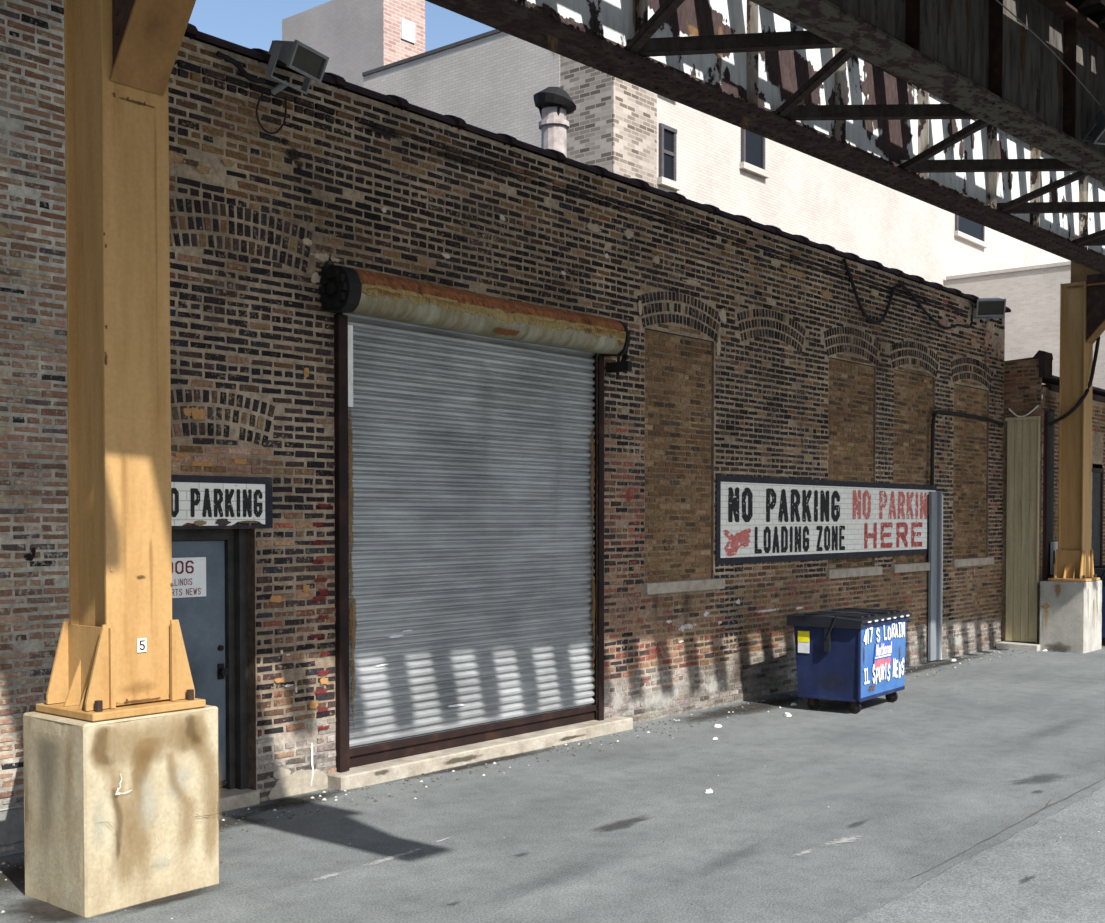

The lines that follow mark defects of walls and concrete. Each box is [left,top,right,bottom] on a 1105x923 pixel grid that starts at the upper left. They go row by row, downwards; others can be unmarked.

peeling [526,0,601,34]
peeling [660,0,735,37]
peeling [715,50,915,106]
peeling [863,120,913,165]
peeling [944,119,975,159]
peeling [997,140,1008,159]
peeling [1049,177,1067,219]
rust [352,268,626,345]